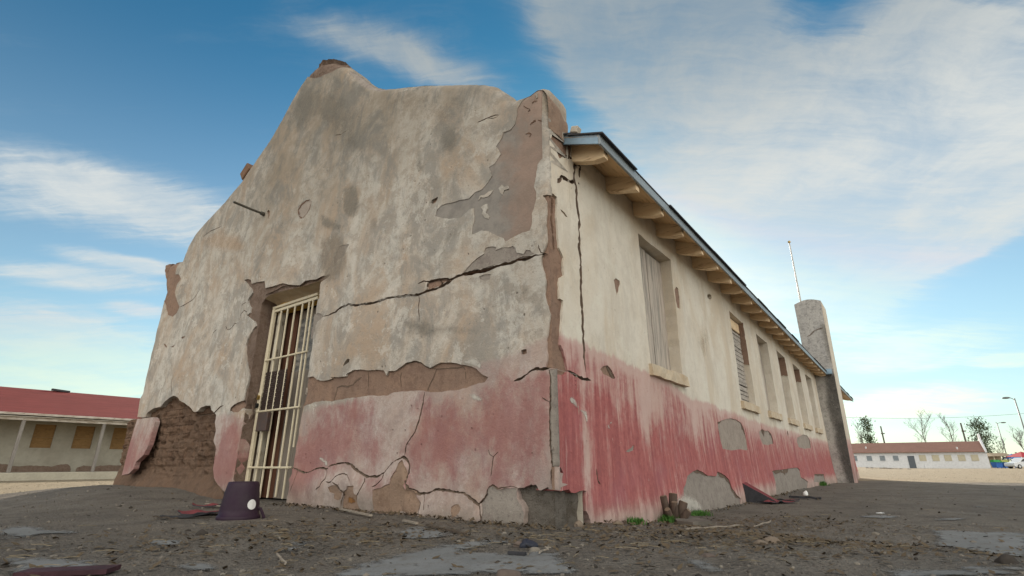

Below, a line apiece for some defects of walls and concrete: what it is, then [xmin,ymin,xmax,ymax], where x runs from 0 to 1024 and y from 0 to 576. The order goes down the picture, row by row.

peeling [433,91,565,375]
crack [322,245,546,320]
crack [514,155,591,481]
spalling [303,361,488,407]
crack [290,393,517,521]
spalling [520,467,584,527]
efflorescence [679,496,701,510]
peeling [683,470,740,512]
peeling [718,418,747,450]
peeling [772,468,825,495]